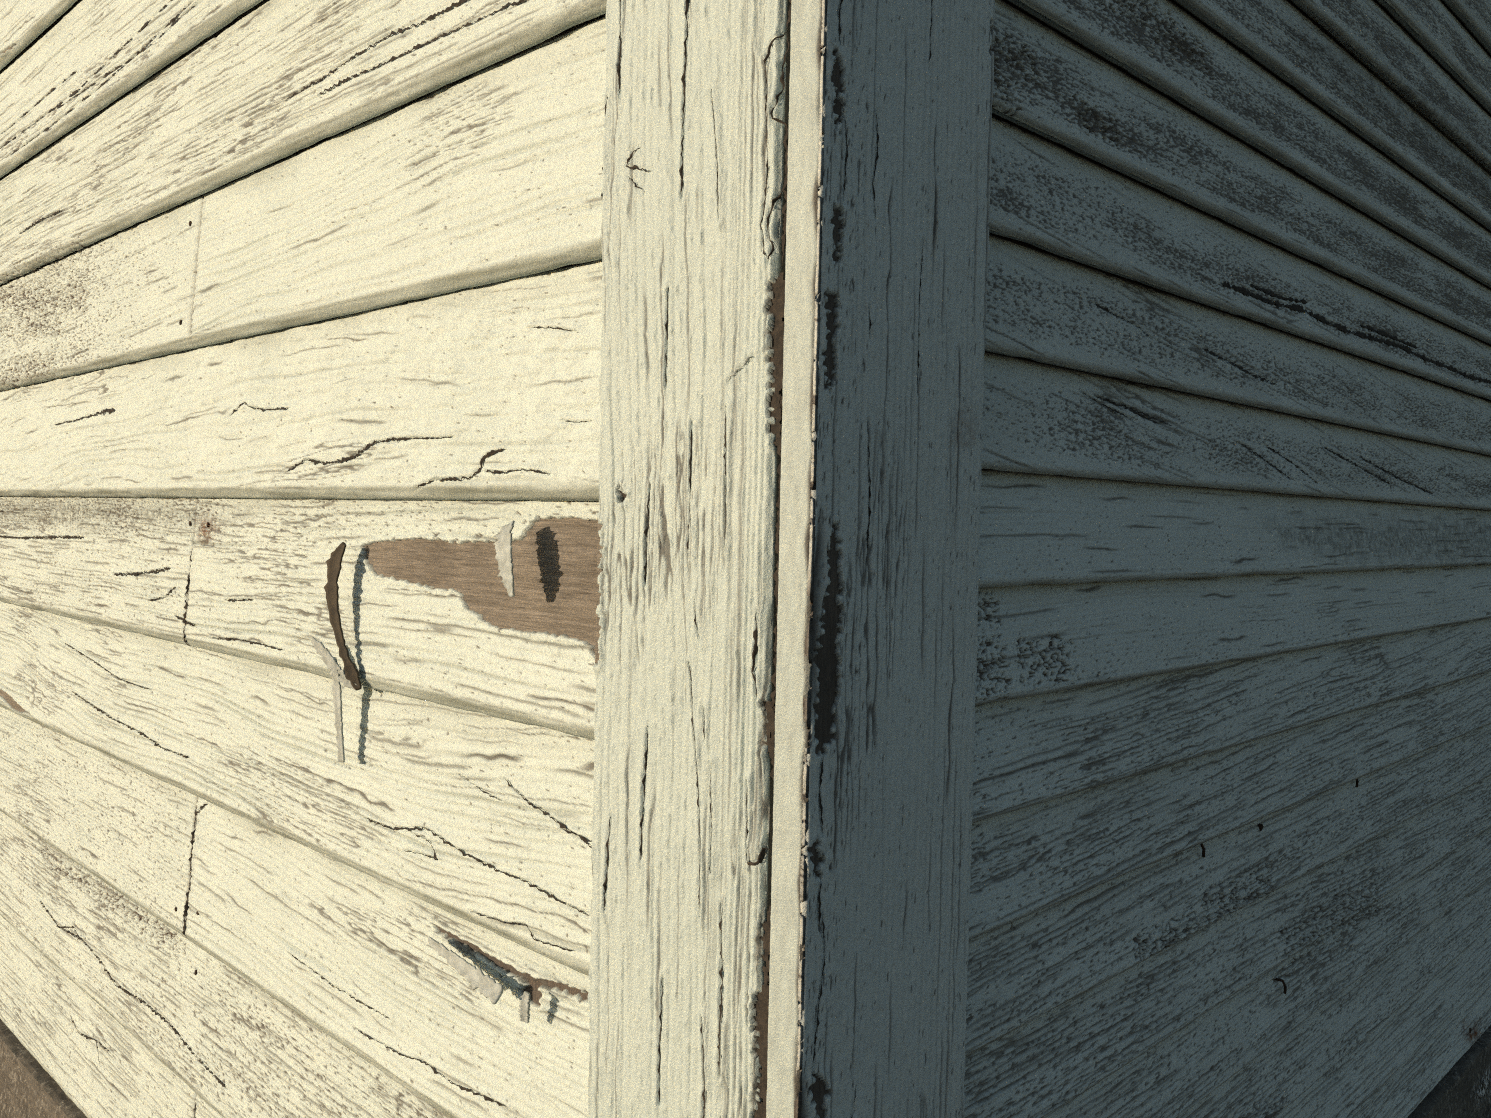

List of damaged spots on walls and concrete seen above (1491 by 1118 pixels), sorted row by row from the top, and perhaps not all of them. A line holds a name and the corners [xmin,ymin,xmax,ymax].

crack [679,0,719,219]
crack [760,32,789,259]
peeling [822,292,837,388]
crack [286,436,550,488]
crack [113,549,282,651]
peeling [365,517,603,663]
peeling [813,525,841,754]
crack [182,804,207,936]
crack [367,726,648,952]
crack [688,599,771,1118]
crack [40,900,227,1118]
crack [291,954,506,1107]